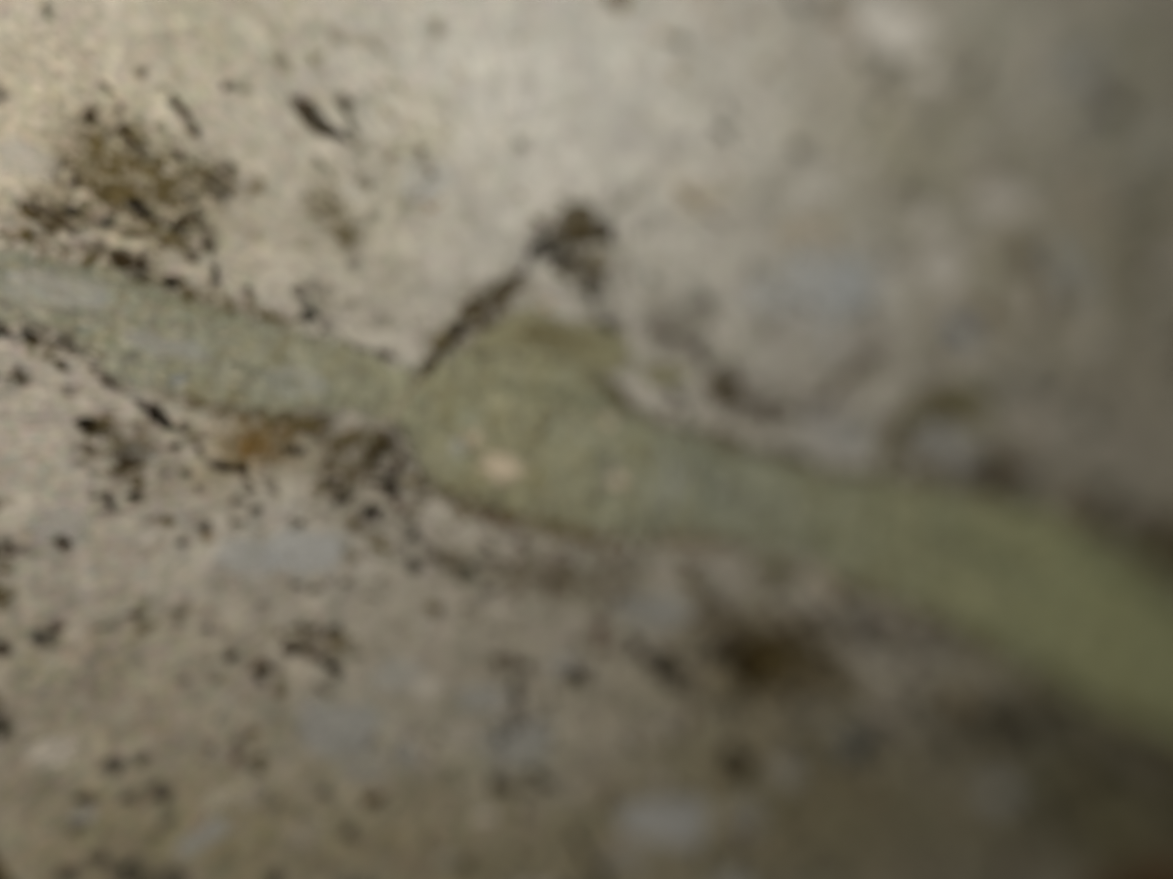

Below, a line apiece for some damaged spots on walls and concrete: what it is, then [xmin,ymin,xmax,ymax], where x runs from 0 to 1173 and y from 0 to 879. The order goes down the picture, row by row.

water stain [0,85,266,285]
water stain [163,275,180,288]
water stain [0,330,69,372]
water stain [4,366,27,387]
water stain [75,413,181,515]
water stain [51,536,72,553]
water stain [31,620,67,647]